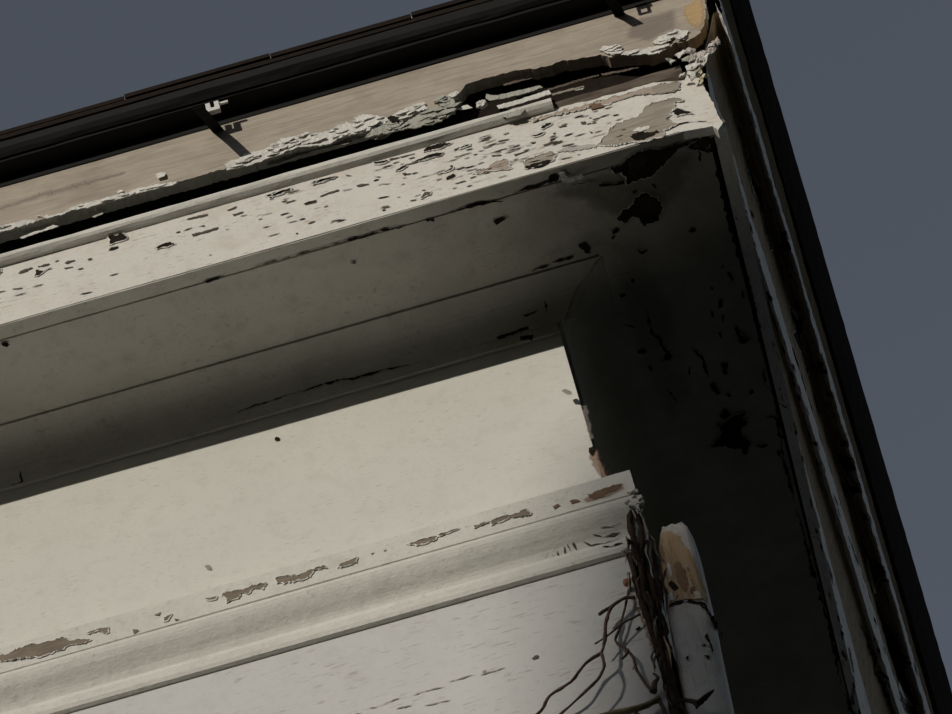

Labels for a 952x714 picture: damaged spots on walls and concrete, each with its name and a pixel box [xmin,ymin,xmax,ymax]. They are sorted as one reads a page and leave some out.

peeling [176,213,227,236]
peeling [224,29,721,236]